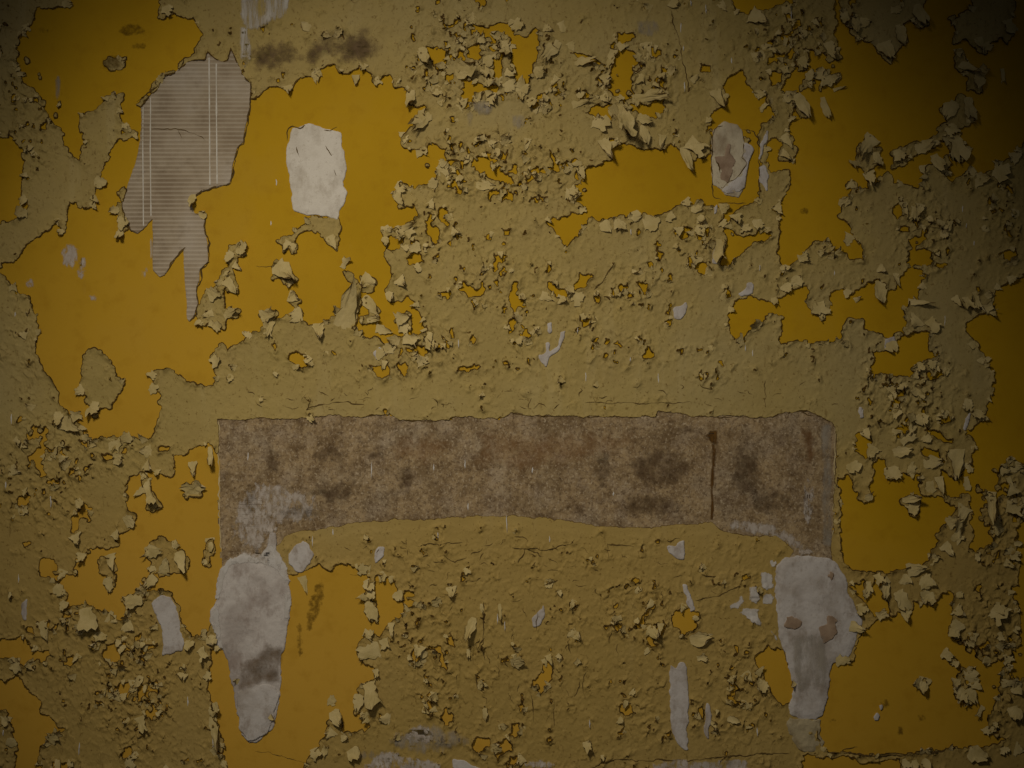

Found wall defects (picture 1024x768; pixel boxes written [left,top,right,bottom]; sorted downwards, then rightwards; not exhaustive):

peeling [0,0,593,561]
peeling [414,23,792,379]
peeling [539,0,1024,376]
flaking render [0,179,1024,768]
leakage [730,520,812,555]